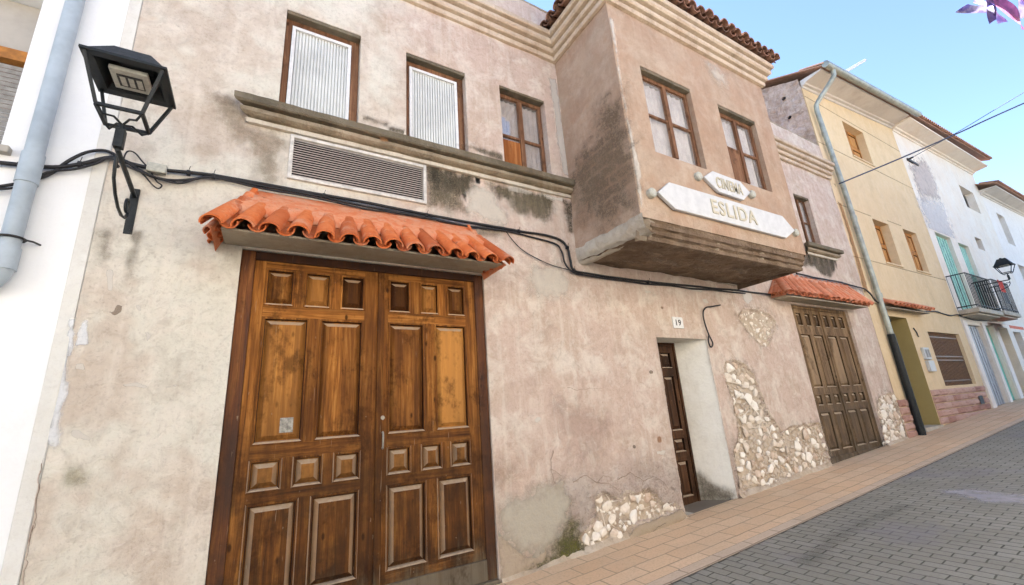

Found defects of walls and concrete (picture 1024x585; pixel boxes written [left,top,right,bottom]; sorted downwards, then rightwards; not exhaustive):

water stain [427,79,639,232]
spalling [717,289,776,347]
crack [550,450,668,493]
spalling [578,340,685,546]
spalling [706,340,831,496]
spalling [877,393,909,447]